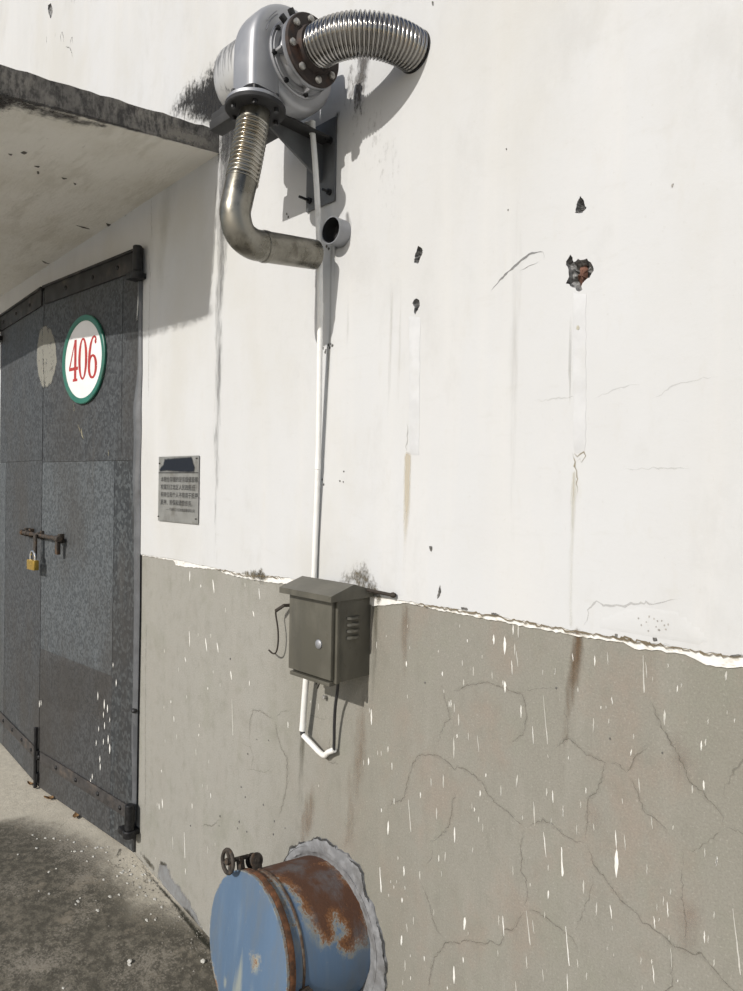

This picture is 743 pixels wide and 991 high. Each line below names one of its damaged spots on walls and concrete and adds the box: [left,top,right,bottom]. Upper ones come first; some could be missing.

damp [0,94,142,132]
damp [175,69,223,125]
spalling [575,196,586,213]
spalling [566,255,594,292]
corrosion [572,632,581,683]